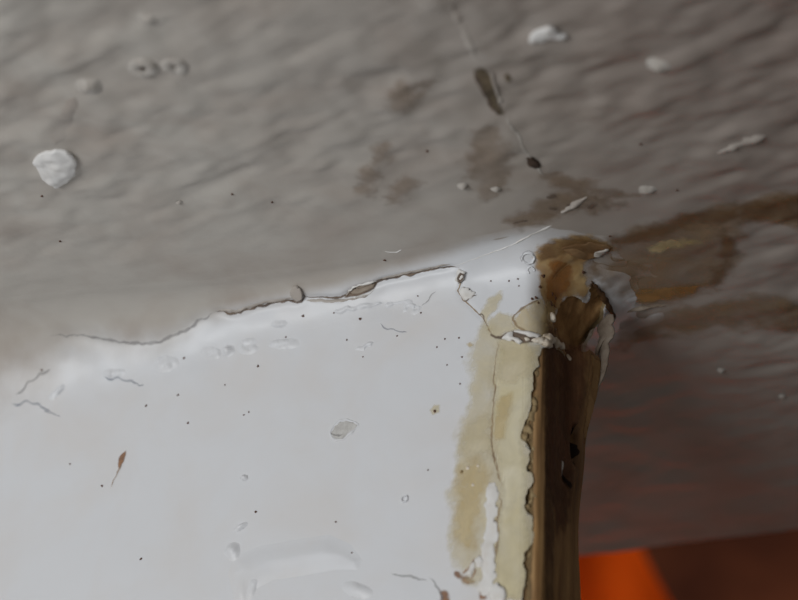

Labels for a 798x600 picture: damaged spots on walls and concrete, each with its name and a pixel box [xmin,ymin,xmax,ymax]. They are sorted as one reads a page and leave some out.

damp [512,195,596,225]
damp [611,211,734,302]
flaking render [490,281,616,388]
crack [215,264,502,557]
damp [451,326,539,599]
flaking render [521,393,538,469]